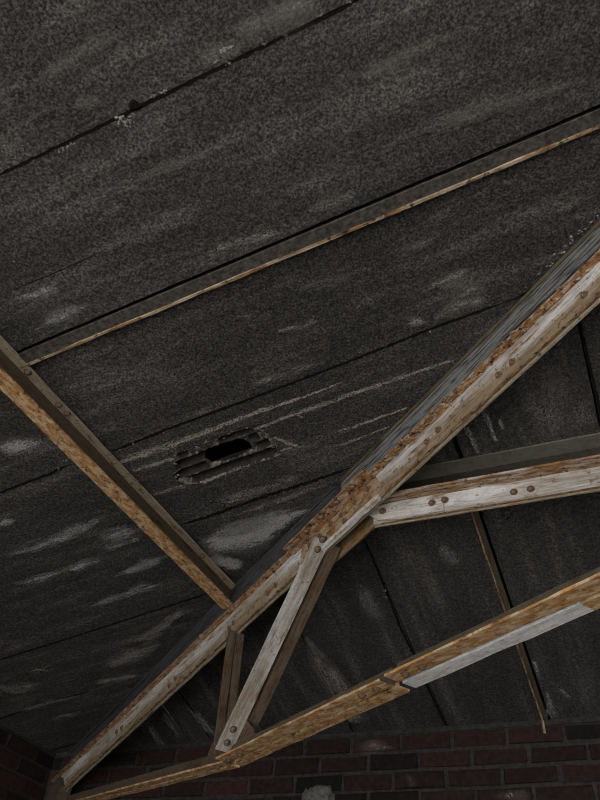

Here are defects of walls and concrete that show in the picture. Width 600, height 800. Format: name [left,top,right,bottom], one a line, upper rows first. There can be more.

hole [171,427,280,484]
damp [119,360,454,472]